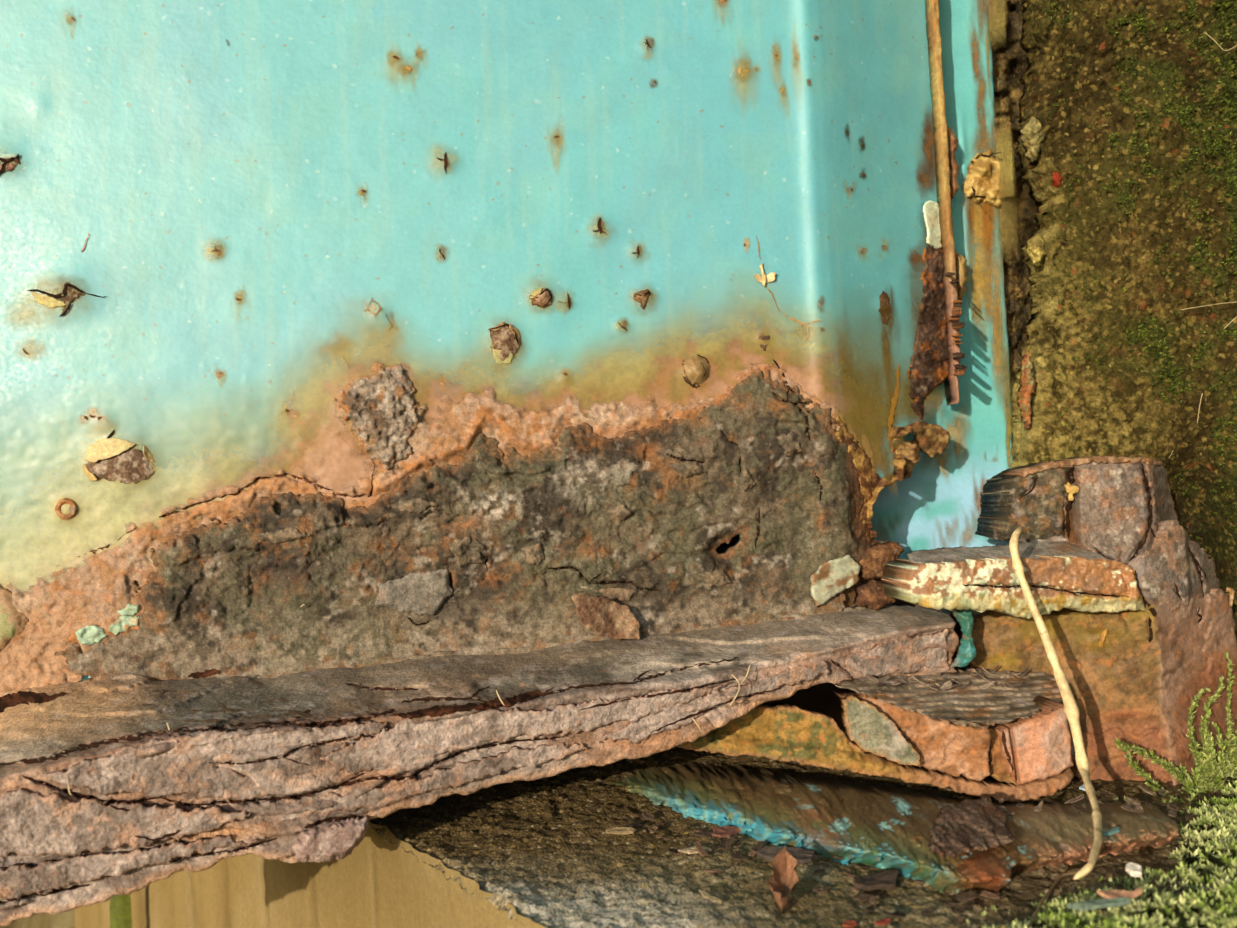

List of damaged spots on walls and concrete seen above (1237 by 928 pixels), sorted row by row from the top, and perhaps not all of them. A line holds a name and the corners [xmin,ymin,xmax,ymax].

rust [0,0,1013,680]
peeling [0,364,876,696]
crack [541,531,659,591]
crack [0,683,565,862]
crack [539,657,779,733]